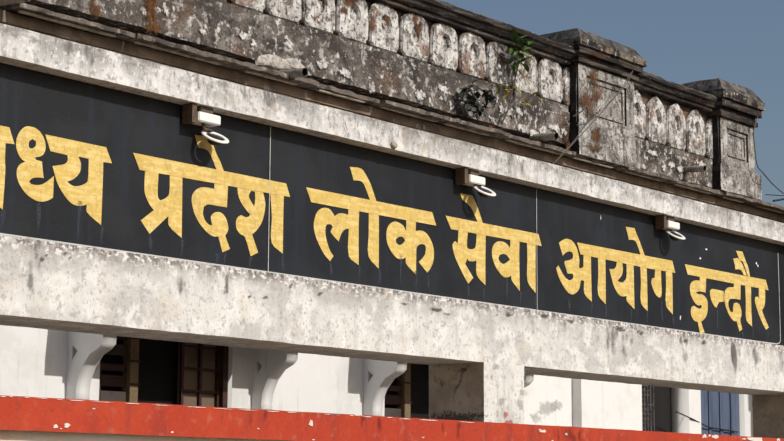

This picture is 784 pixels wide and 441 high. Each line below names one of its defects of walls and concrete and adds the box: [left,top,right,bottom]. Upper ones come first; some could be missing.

rust [145,0,161,33]
rust [581,69,604,117]
rust [589,127,600,152]